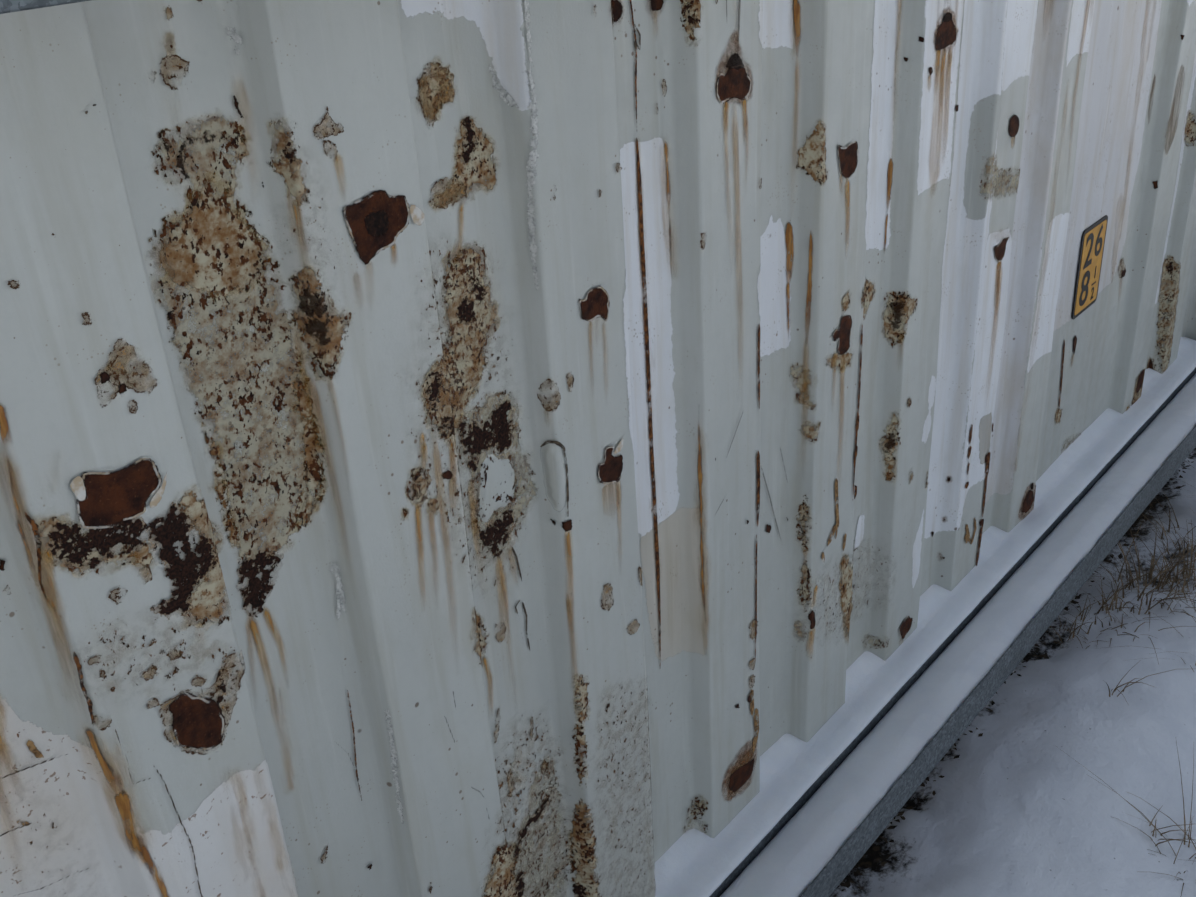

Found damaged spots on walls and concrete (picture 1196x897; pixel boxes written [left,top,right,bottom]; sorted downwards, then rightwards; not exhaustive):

corrosion [343,116,497,265]
corrosion [0,404,9,442]
corrosion [10,95,352,758]
corrosion [403,241,539,592]
corrosion [484,675,655,897]
corrosion [722,689,759,800]